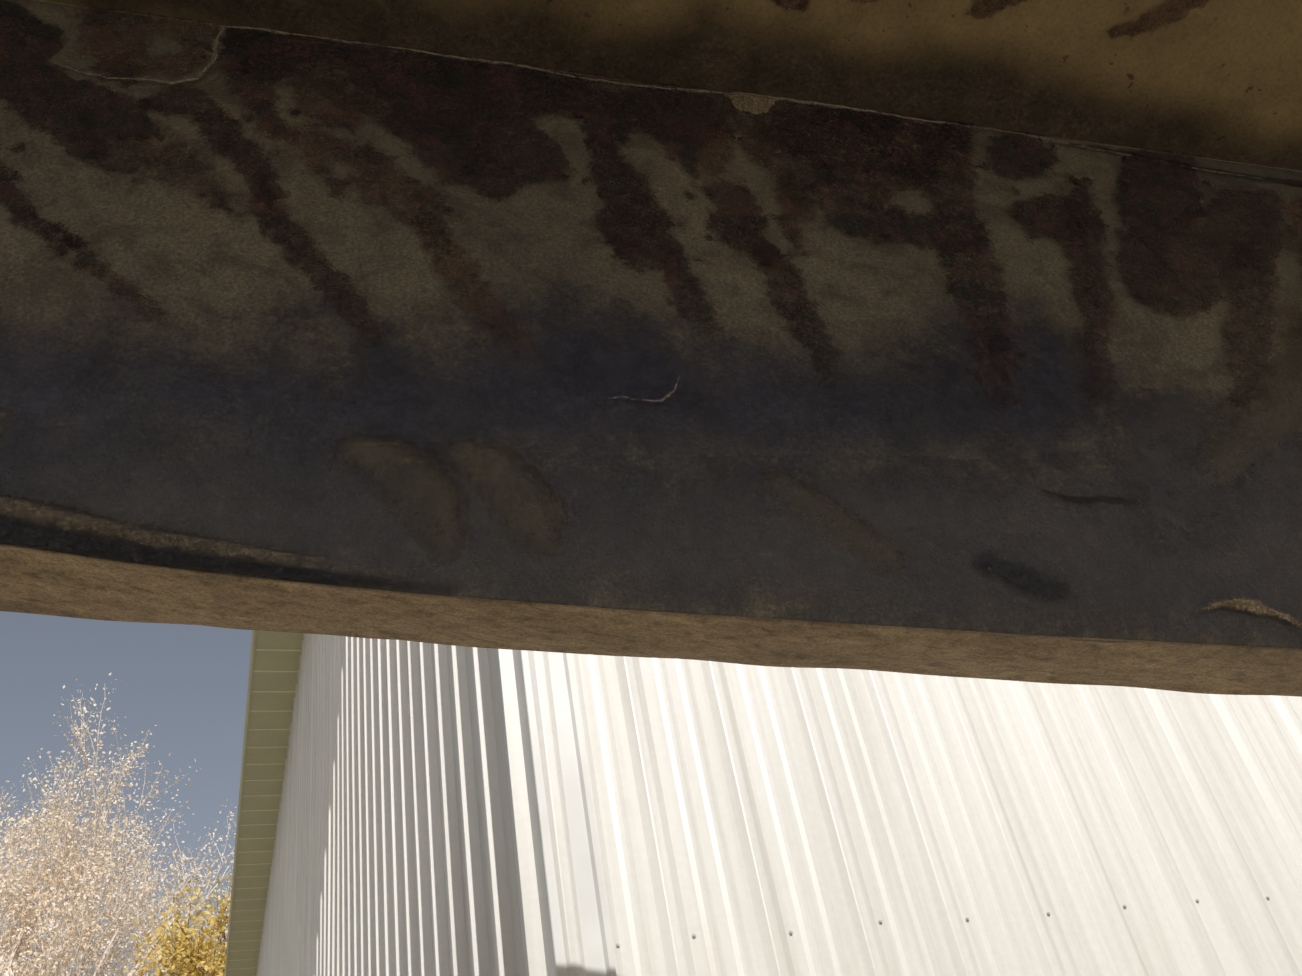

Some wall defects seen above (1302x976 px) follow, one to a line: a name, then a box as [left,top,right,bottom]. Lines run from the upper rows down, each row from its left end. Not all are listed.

crack [53,26,1302,185]
corrosion [1108,0,1209,38]
corrosion [0,143,165,318]
corrosion [136,83,377,337]
leakage [0,310,1302,649]
peeling [1203,598,1302,626]